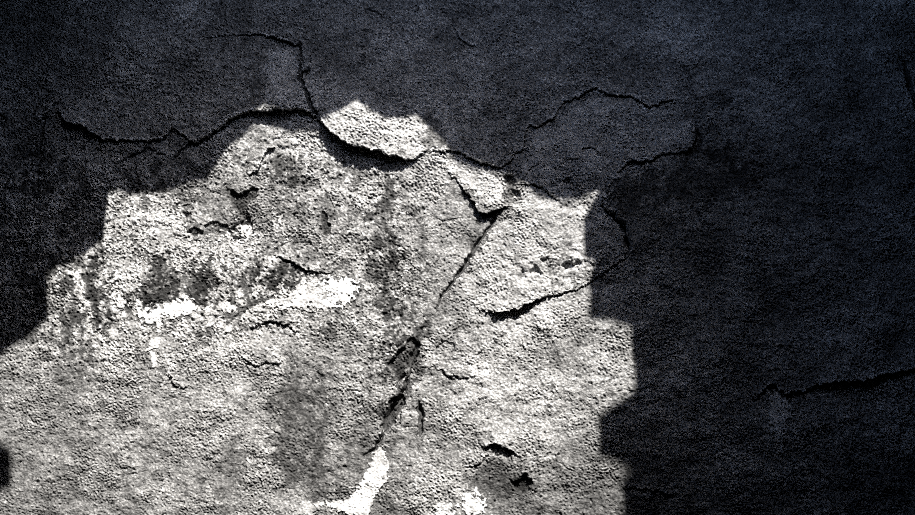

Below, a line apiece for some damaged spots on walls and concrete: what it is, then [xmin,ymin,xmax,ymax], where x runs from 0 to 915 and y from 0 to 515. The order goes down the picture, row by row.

crack [297,42,319,121]
crack [120,142,192,164]
crack [602,207,631,257]
crack [363,218,497,456]